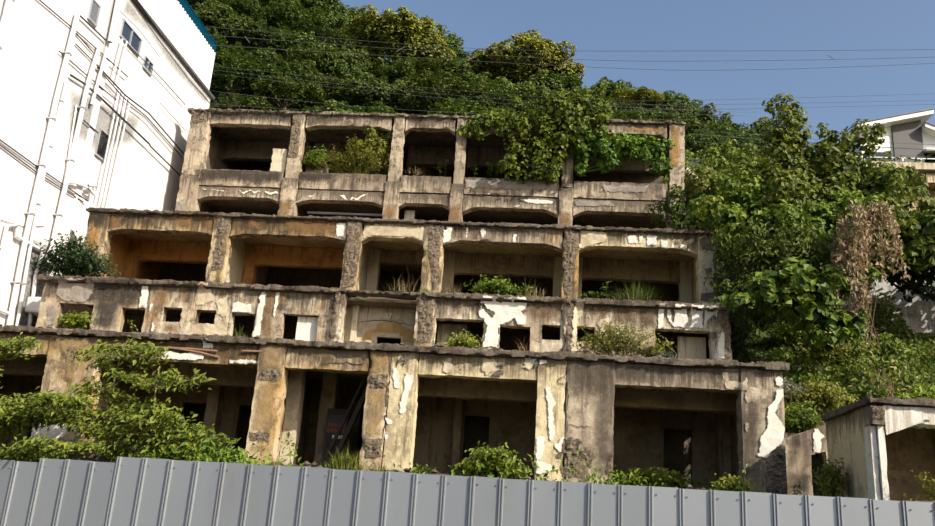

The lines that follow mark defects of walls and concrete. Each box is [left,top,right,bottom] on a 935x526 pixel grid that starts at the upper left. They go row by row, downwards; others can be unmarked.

peeling [443,227,452,243]
peeling [151,282,282,382]
spalling [329,221,426,338]
peeling [370,367,414,414]
peeling [442,357,465,373]
peeling [479,296,527,376]
peeling [524,355,547,370]
peeling [658,230,731,359]
spalling [722,372,762,403]
spalling [364,418,393,458]
spalling [535,386,594,478]
peeling [758,377,787,494]